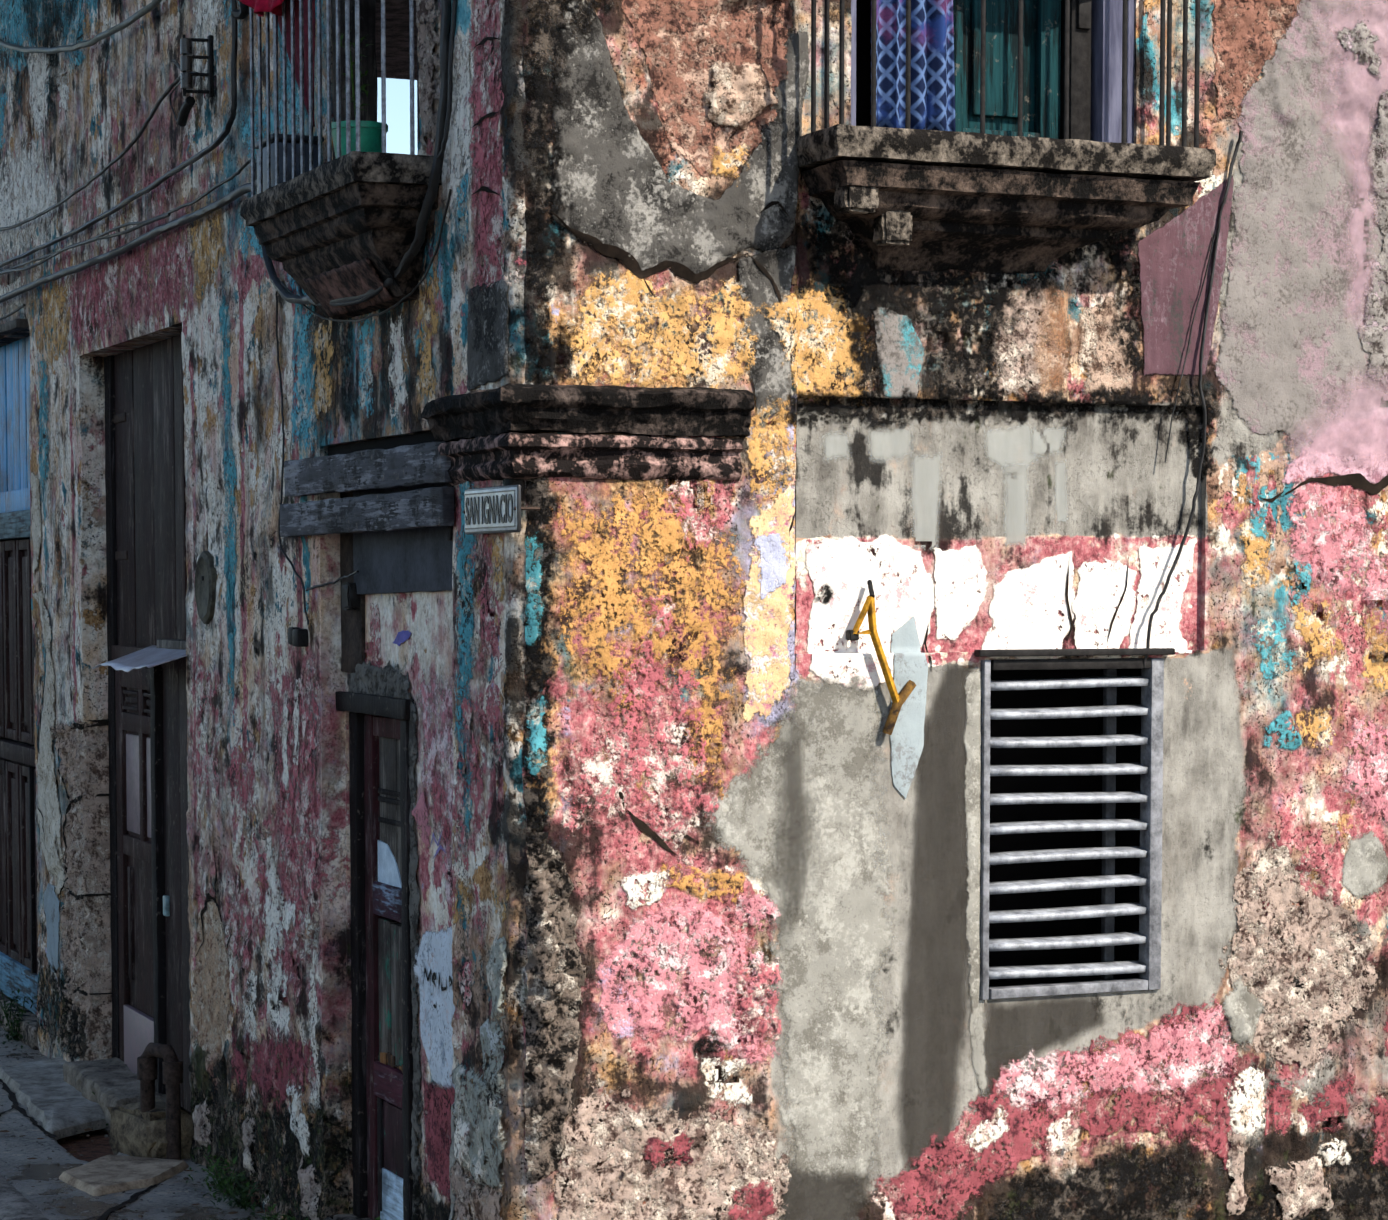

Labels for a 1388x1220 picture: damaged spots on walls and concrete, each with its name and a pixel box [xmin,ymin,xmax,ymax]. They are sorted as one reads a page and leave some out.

flaking render [621,0,794,177]
leakage [788,168,1220,547]
peeling [1239,20,1388,693]
crack [1260,473,1388,502]
crack [33,586,111,901]
flaking render [32,589,112,1061]
crack [195,841,232,960]
leakage [522,477,560,852]
peeling [489,270,1197,1220]
crack [86,1184,159,1220]
leakage [775,1168,865,1220]
leakage [989,1123,1388,1220]